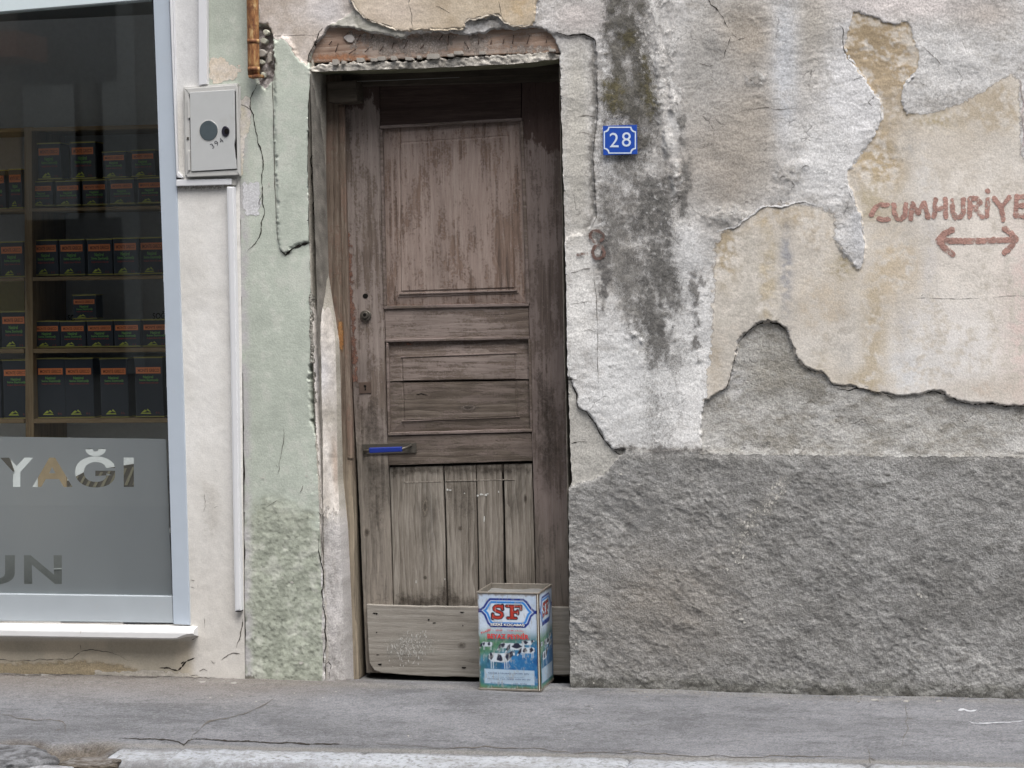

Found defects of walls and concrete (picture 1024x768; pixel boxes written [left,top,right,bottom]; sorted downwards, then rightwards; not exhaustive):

crack [243,29,322,252]
peeling [258,0,538,89]
water stain [594,0,693,378]
peeling [634,0,685,113]
peeling [700,12,1024,459]